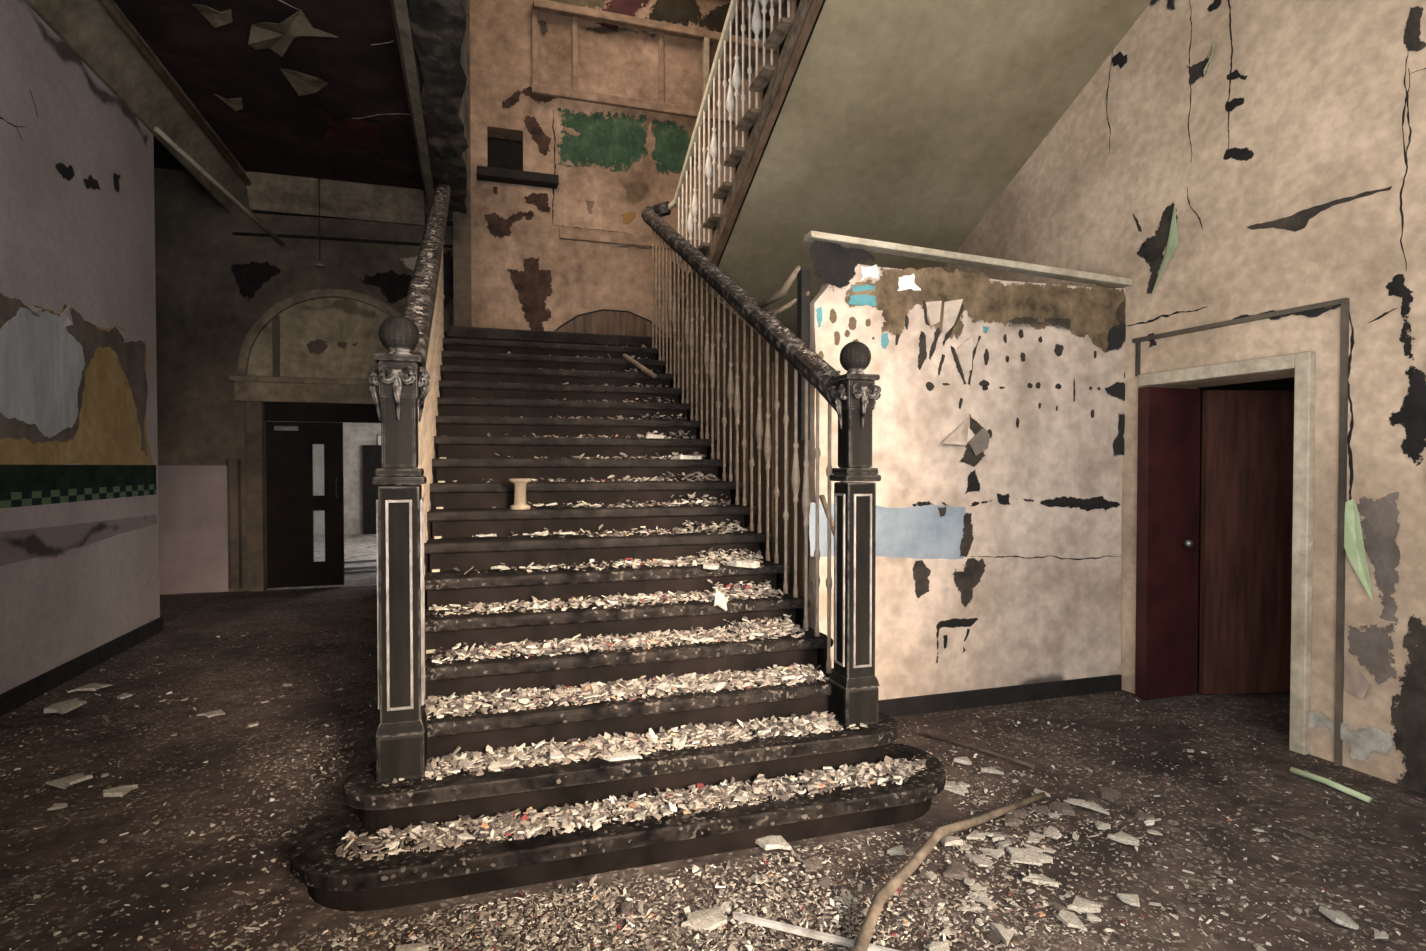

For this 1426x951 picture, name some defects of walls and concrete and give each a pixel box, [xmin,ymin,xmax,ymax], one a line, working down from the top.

peeling [502,86,702,176]
flaking render [1225,98,1244,112]
flaking render [1226,70,1248,80]
flaking render [1223,147,1254,161]
crack [1399,52,1426,269]
peeling [1403,6,1426,52]
flaking render [443,250,453,309]
peeling [1133,202,1178,294]
peeling [0,280,153,465]
crack [1347,302,1397,500]
flaking render [809,240,1126,663]
flaking render [1309,492,1426,795]